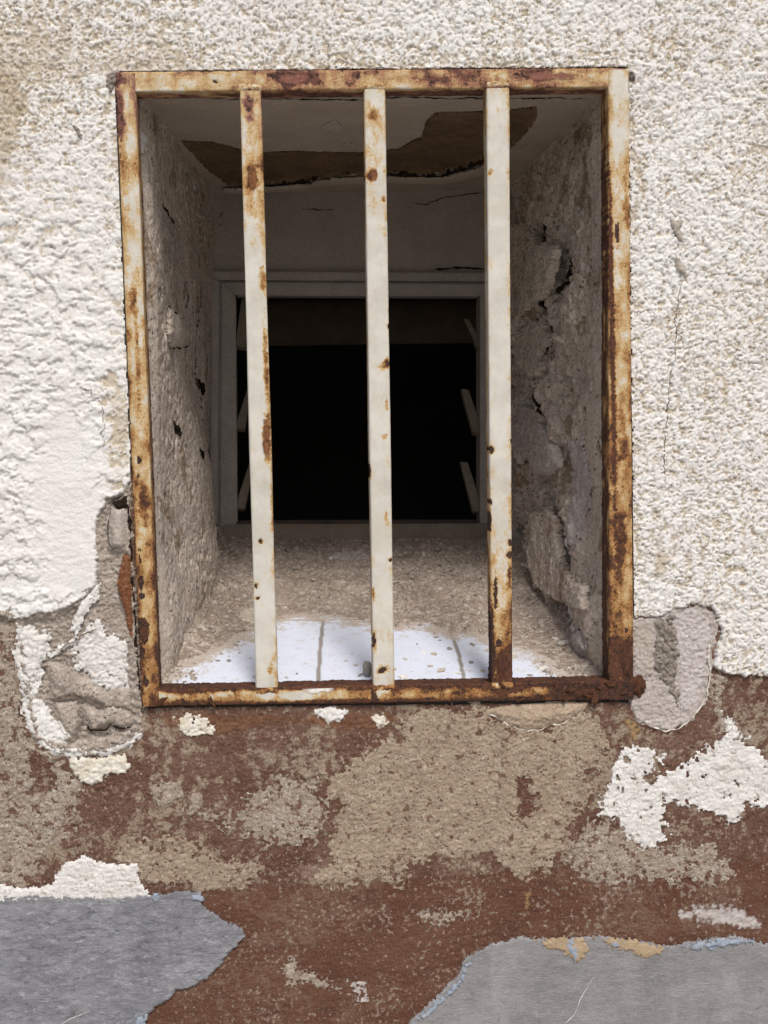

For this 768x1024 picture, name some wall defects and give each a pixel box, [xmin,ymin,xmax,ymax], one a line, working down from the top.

corrosion [247,167,257,190]
corrosion [117,555,149,641]
corrosion [622,638,646,698]
corrosion [165,713,396,735]
peeling [0,481,768,1024]